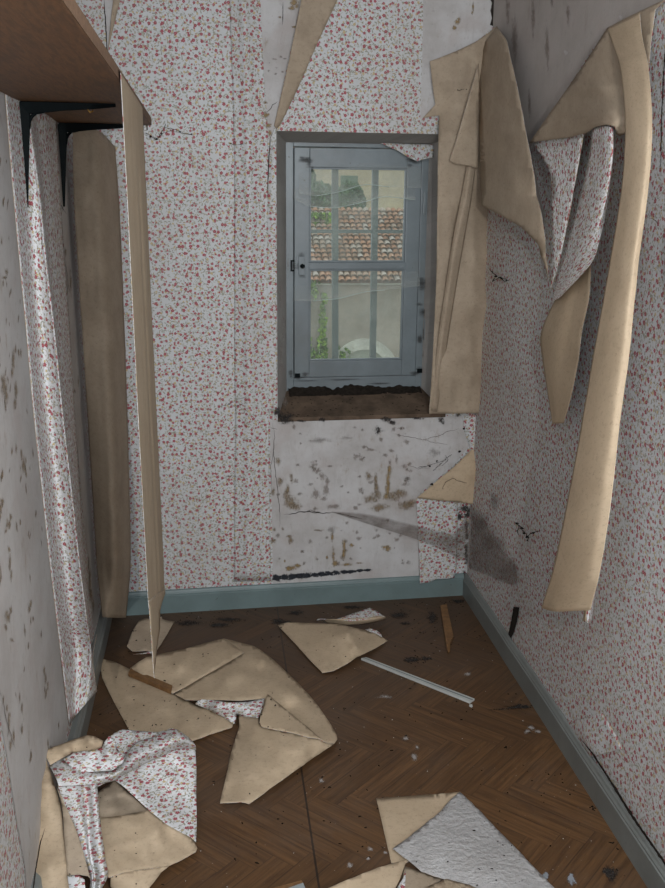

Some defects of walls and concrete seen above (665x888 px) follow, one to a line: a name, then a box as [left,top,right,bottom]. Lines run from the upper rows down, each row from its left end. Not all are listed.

peeling [261,0,337,145]
peeling [420,0,662,226]
peeling [57,122,99,631]
peeling [0,92,68,888]
water stain [272,475,300,509]
water stain [272,569,371,582]
peeling [270,416,476,584]
water stain [365,474,416,512]